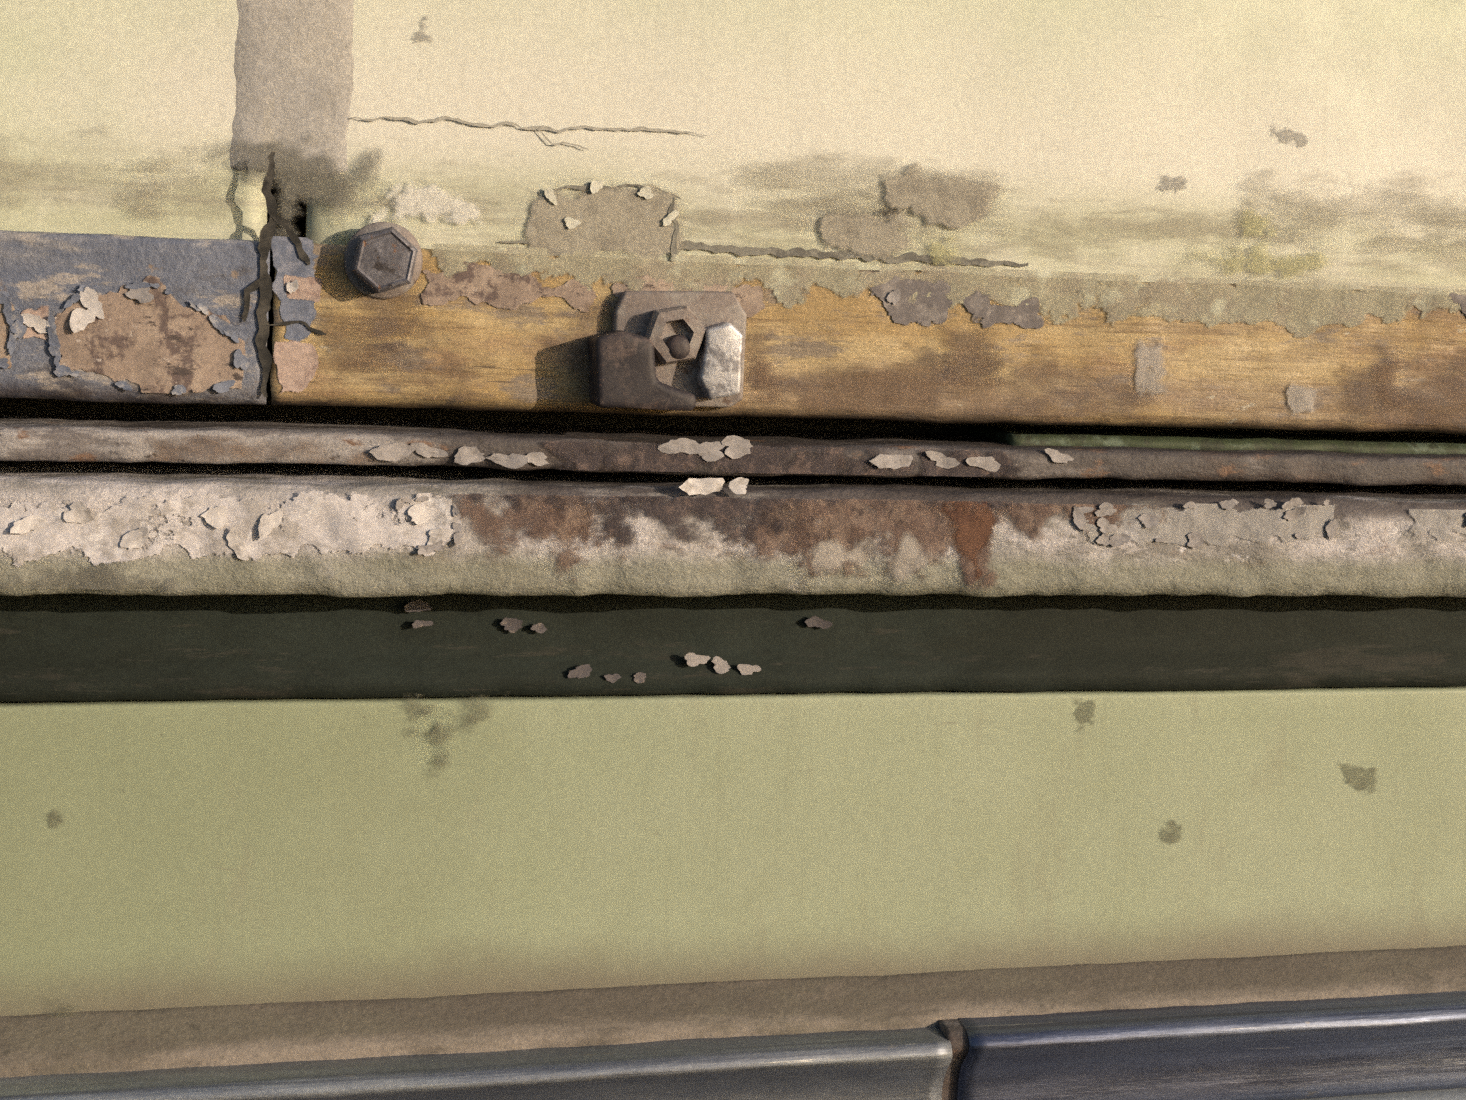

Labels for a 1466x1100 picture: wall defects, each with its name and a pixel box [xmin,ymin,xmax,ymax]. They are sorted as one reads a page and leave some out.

damp [236,142,380,237]
damp [372,184,480,224]
crack [351,116,1028,267]
crack [242,152,326,397]
peeling [421,164,1466,338]
peeling [0,275,250,395]
peeling [658,435,753,495]
peeling [870,450,1001,472]
peeling [0,491,462,567]
corrosion [451,494,613,580]
corrosion [746,499,1150,587]
peeling [1072,498,1338,548]